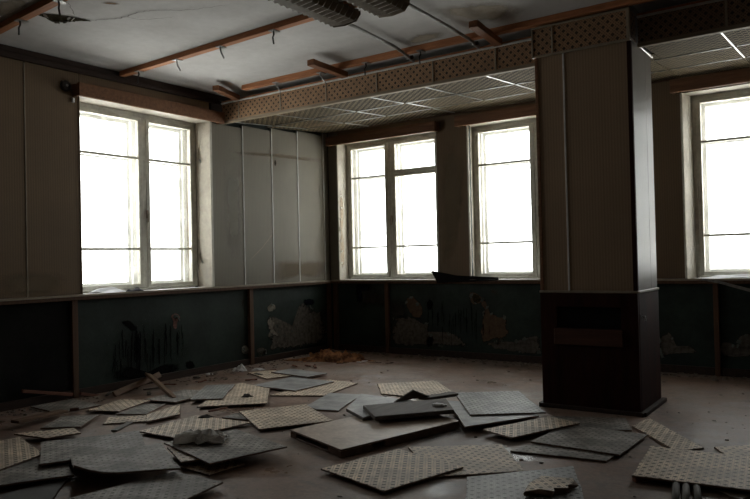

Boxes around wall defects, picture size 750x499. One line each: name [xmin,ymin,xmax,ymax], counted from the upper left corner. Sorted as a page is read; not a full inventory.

flaking render [39,14,89,24]
peeling [267,303,327,350]